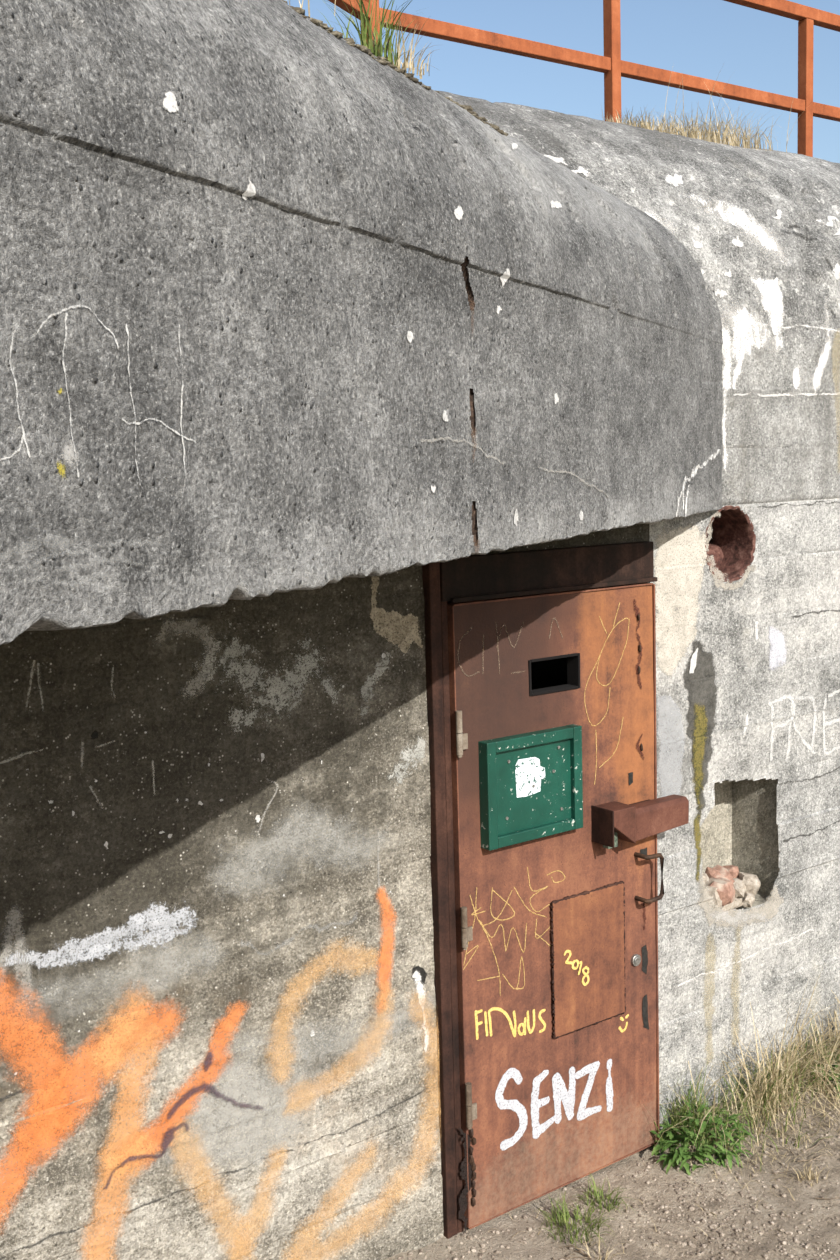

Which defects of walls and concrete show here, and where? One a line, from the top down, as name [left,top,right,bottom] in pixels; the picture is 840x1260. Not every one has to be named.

damp [544,155,589,176]
damp [793,312,831,393]
spalling [705,511,755,590]
peeling [359,576,423,717]
spalling [697,866,784,929]
crack [0,1086,429,1260]